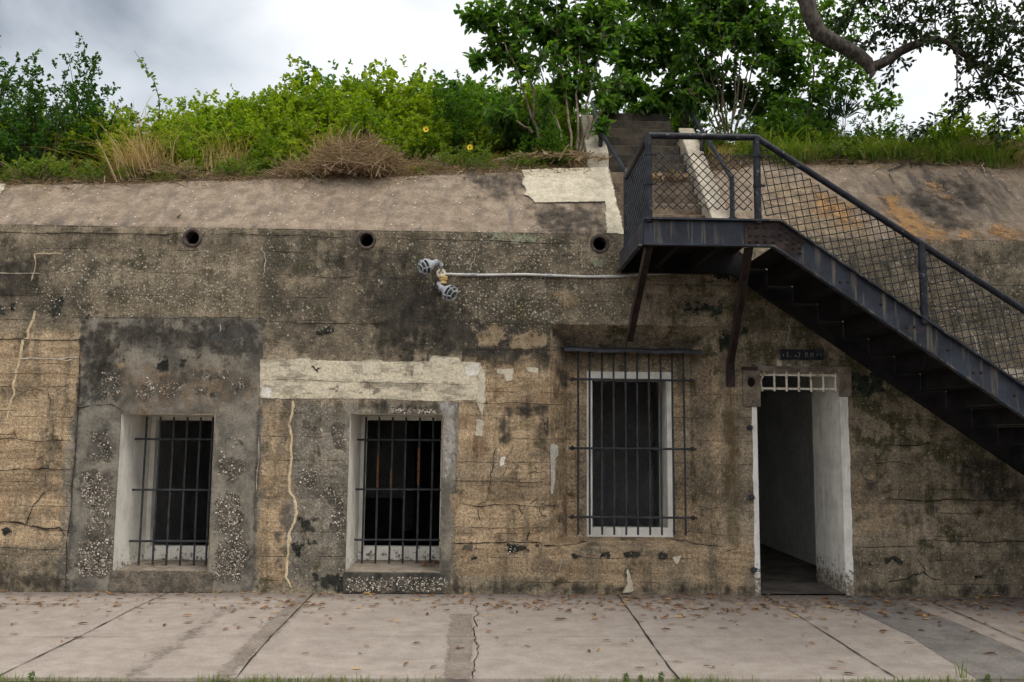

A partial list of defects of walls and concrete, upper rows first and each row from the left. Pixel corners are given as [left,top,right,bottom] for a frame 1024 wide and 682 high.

leakage [78,315,266,405]
crack [0,232,391,588]
leakage [325,249,547,367]
peeling [476,323,548,351]
crack [449,445,589,550]
crack [868,538,1024,582]